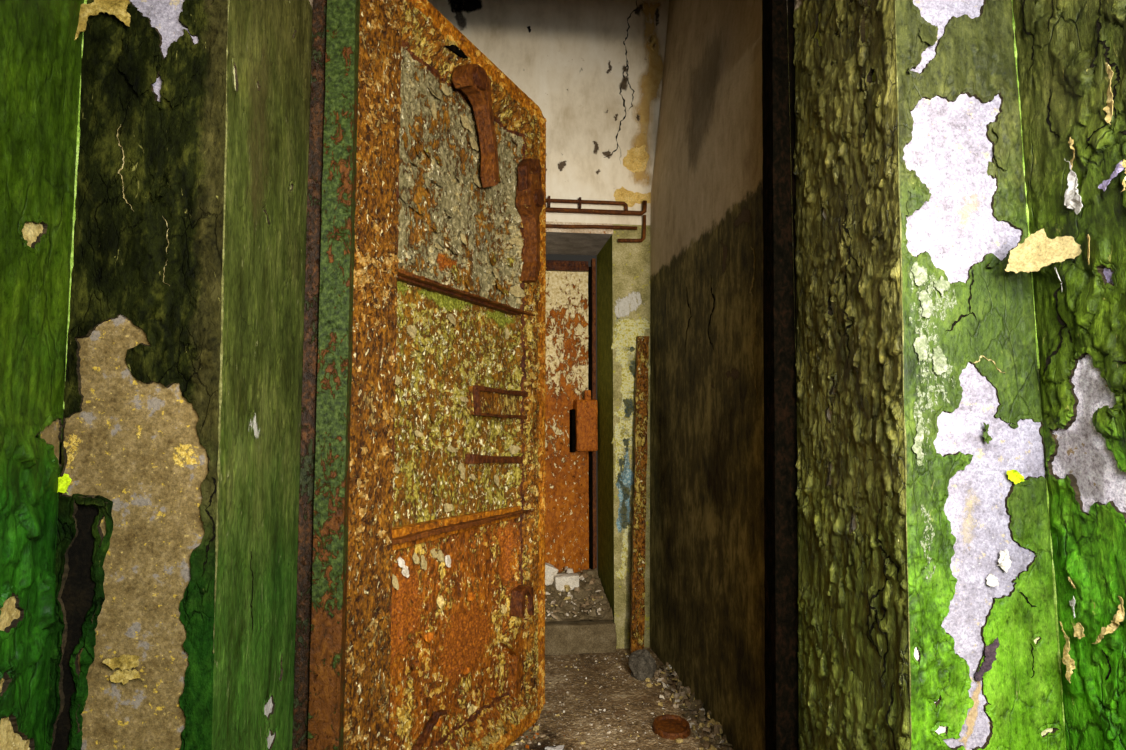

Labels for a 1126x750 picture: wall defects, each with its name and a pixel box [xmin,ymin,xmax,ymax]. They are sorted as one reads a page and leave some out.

peeling [74,0,203,110]
crack [604,0,638,158]
spalling [857,64,876,100]
flaking render [18,215,49,253]
corrosion [437,253,458,271]
flaking render [36,34,239,750]
peeling [895,0,1126,750]
flaking render [0,585,27,639]
corrosion [390,568,424,664]
corrosion [438,601,492,693]
flaking render [0,664,39,750]